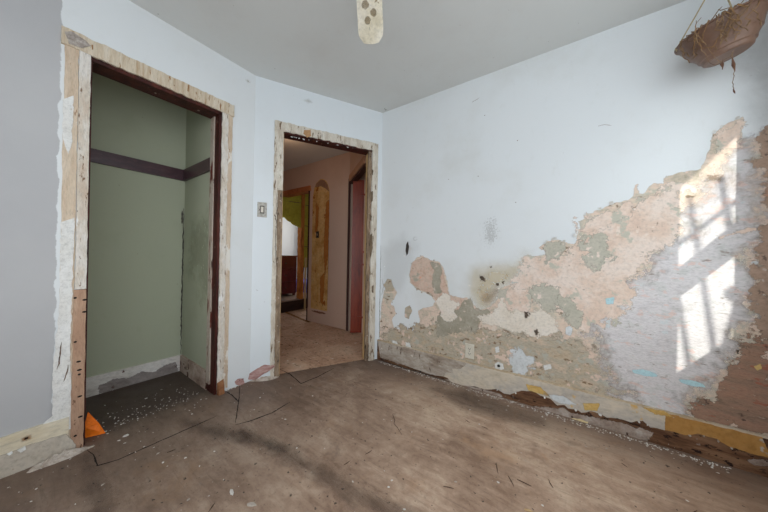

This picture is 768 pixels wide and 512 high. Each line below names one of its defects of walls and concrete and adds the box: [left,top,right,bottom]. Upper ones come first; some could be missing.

spalling [235,365,275,385]
peeling [372,116,768,466]